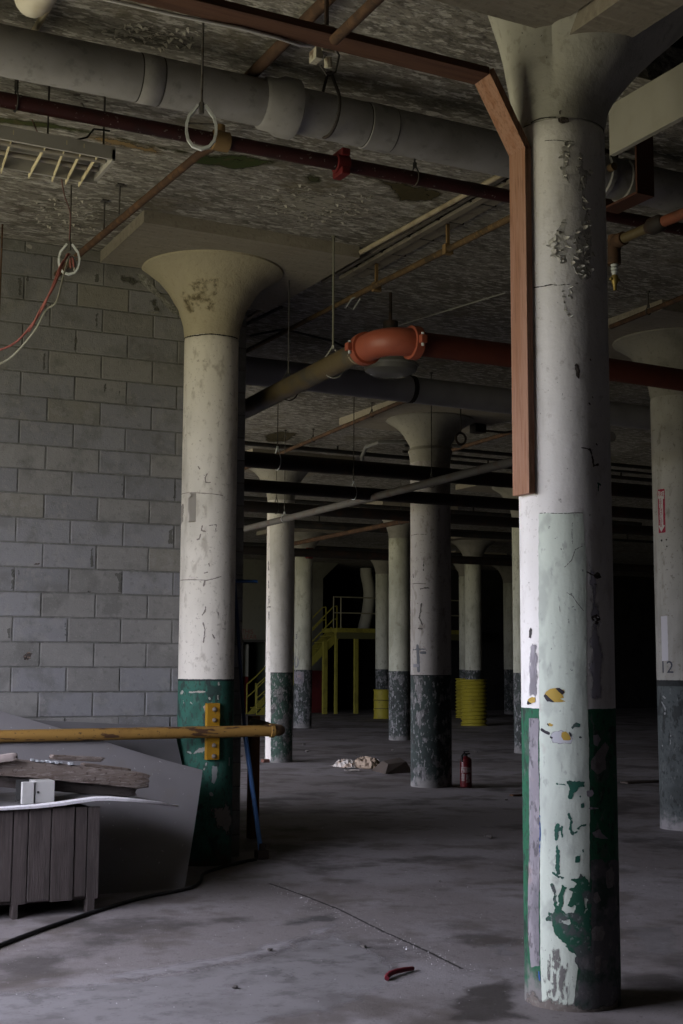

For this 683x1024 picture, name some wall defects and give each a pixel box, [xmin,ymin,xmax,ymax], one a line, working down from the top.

peeling [546,142,596,318]
peeling [187,747,230,796]
peeling [526,718,621,1013]